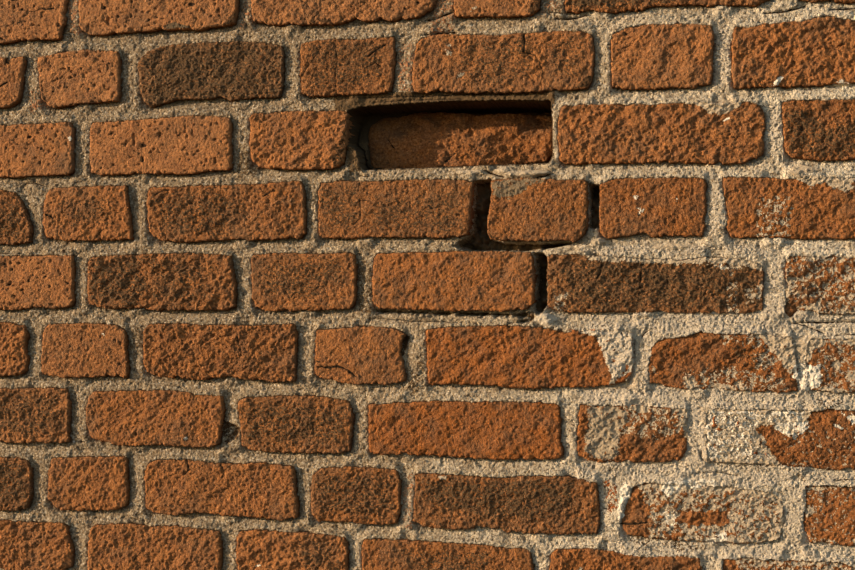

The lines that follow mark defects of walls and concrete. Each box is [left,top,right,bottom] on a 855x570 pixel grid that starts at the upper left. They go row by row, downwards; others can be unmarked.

damp [623,535,707,553]